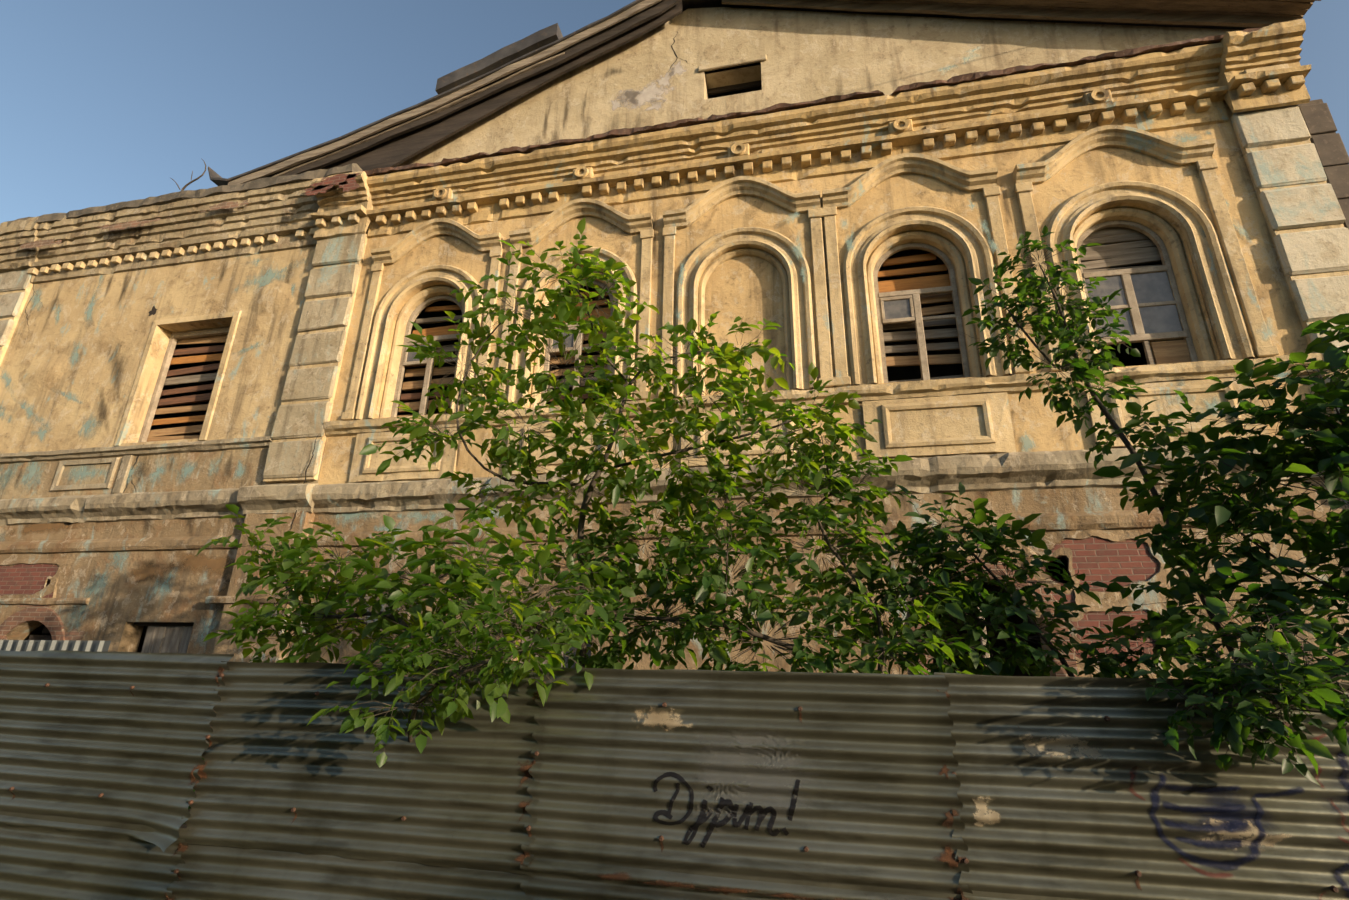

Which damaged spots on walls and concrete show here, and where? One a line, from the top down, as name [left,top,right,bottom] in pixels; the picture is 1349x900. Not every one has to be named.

flaking render [612,62,685,110]
flaking render [0,558,76,608]
flaking render [1021,529,1178,676]
corrosion [597,872,814,900]